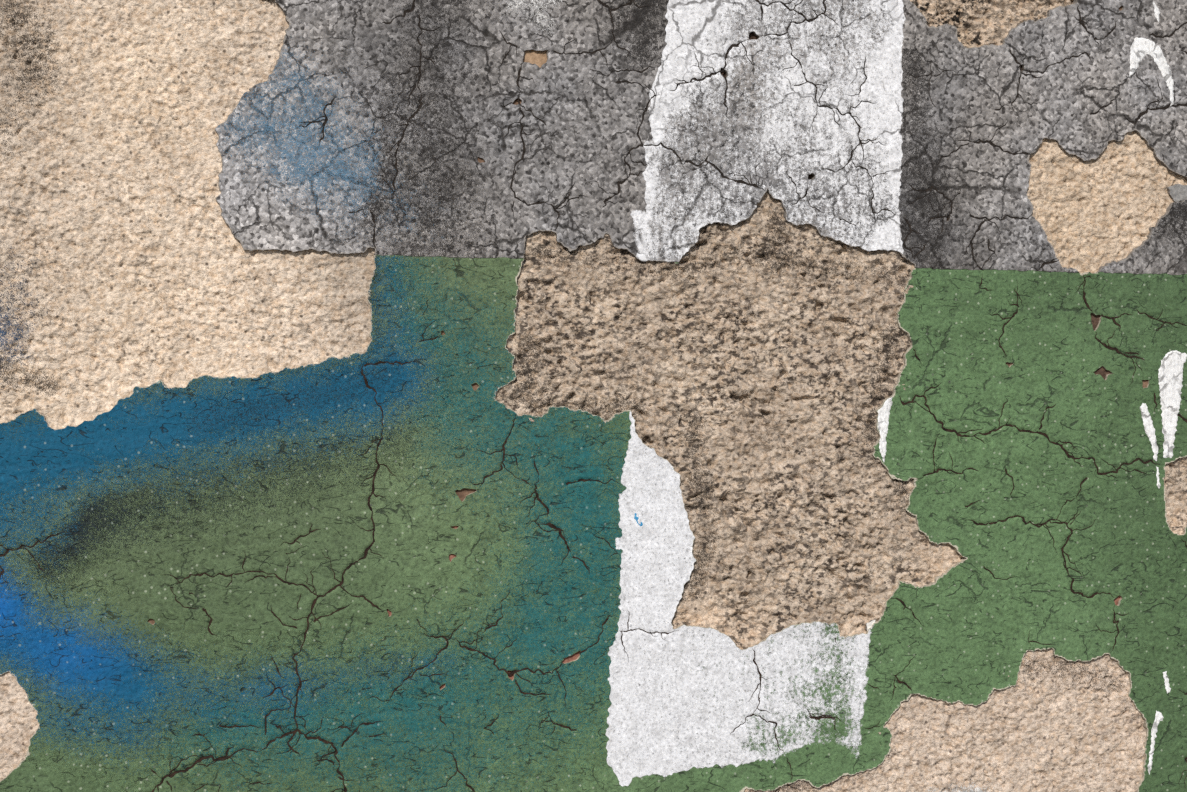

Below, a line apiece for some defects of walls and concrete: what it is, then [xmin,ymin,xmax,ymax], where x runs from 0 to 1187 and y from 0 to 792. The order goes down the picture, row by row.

flaking render [0,0,375,429]
crack [349,0,436,247]
crack [499,0,1116,355]
flaking render [1027,131,1187,273]
crack [1090,77,1187,126]
crack [122,316,674,792]
flaking render [495,191,964,649]
crack [900,349,1160,653]
crack [1076,276,1187,422]
flaking render [1164,456,1187,535]
flaking render [0,672,39,780]
flaking render [744,648,1146,792]